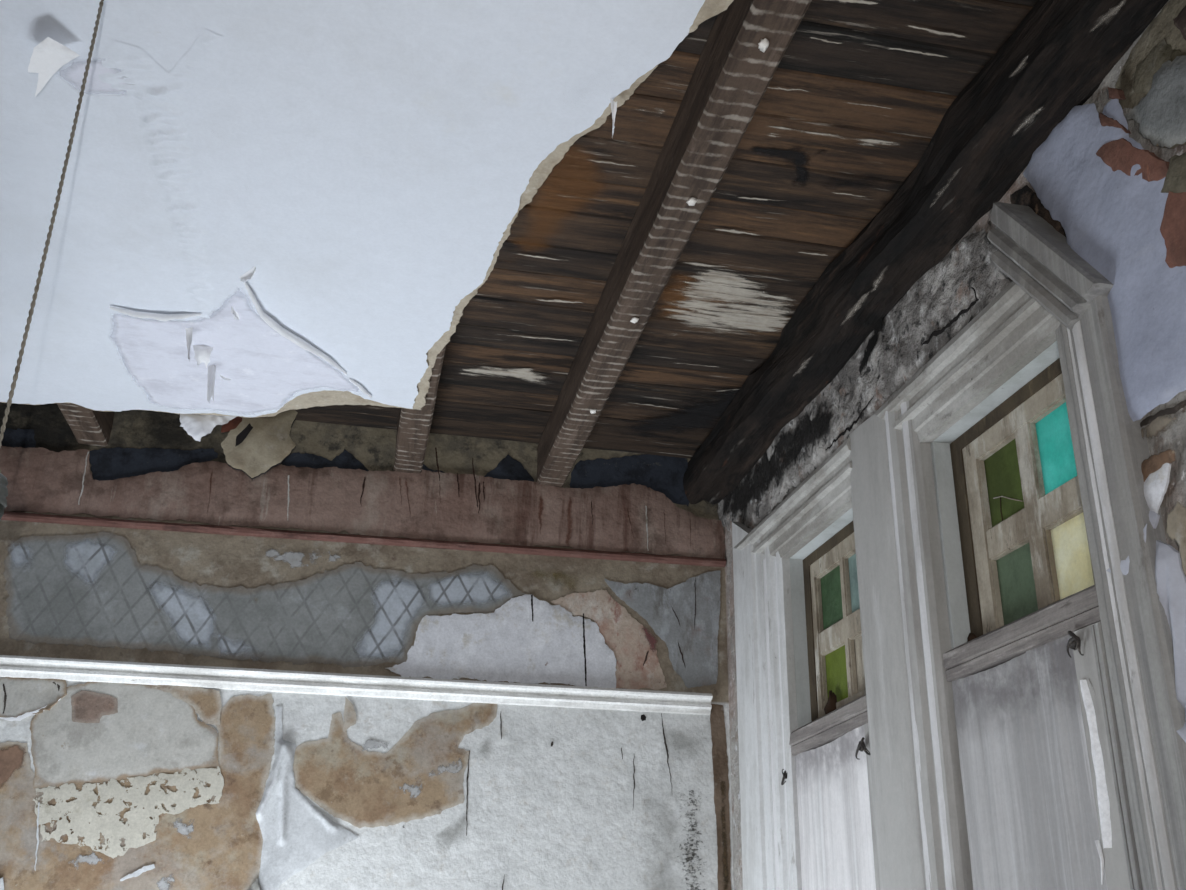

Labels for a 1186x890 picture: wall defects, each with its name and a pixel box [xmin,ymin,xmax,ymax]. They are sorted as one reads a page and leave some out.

peeling [28,37,131,97]
flaking render [689,0,734,33]
peeling [110,65,658,418]
peeling [1010,0,1186,438]
flaking render [717,228,1013,534]
peeling [484,455,534,482]
peeling [569,454,689,506]
peeling [0,677,118,723]
peeling [0,685,276,890]
peeling [293,697,497,828]
peeling [385,589,667,690]
leakage [680,704,732,890]